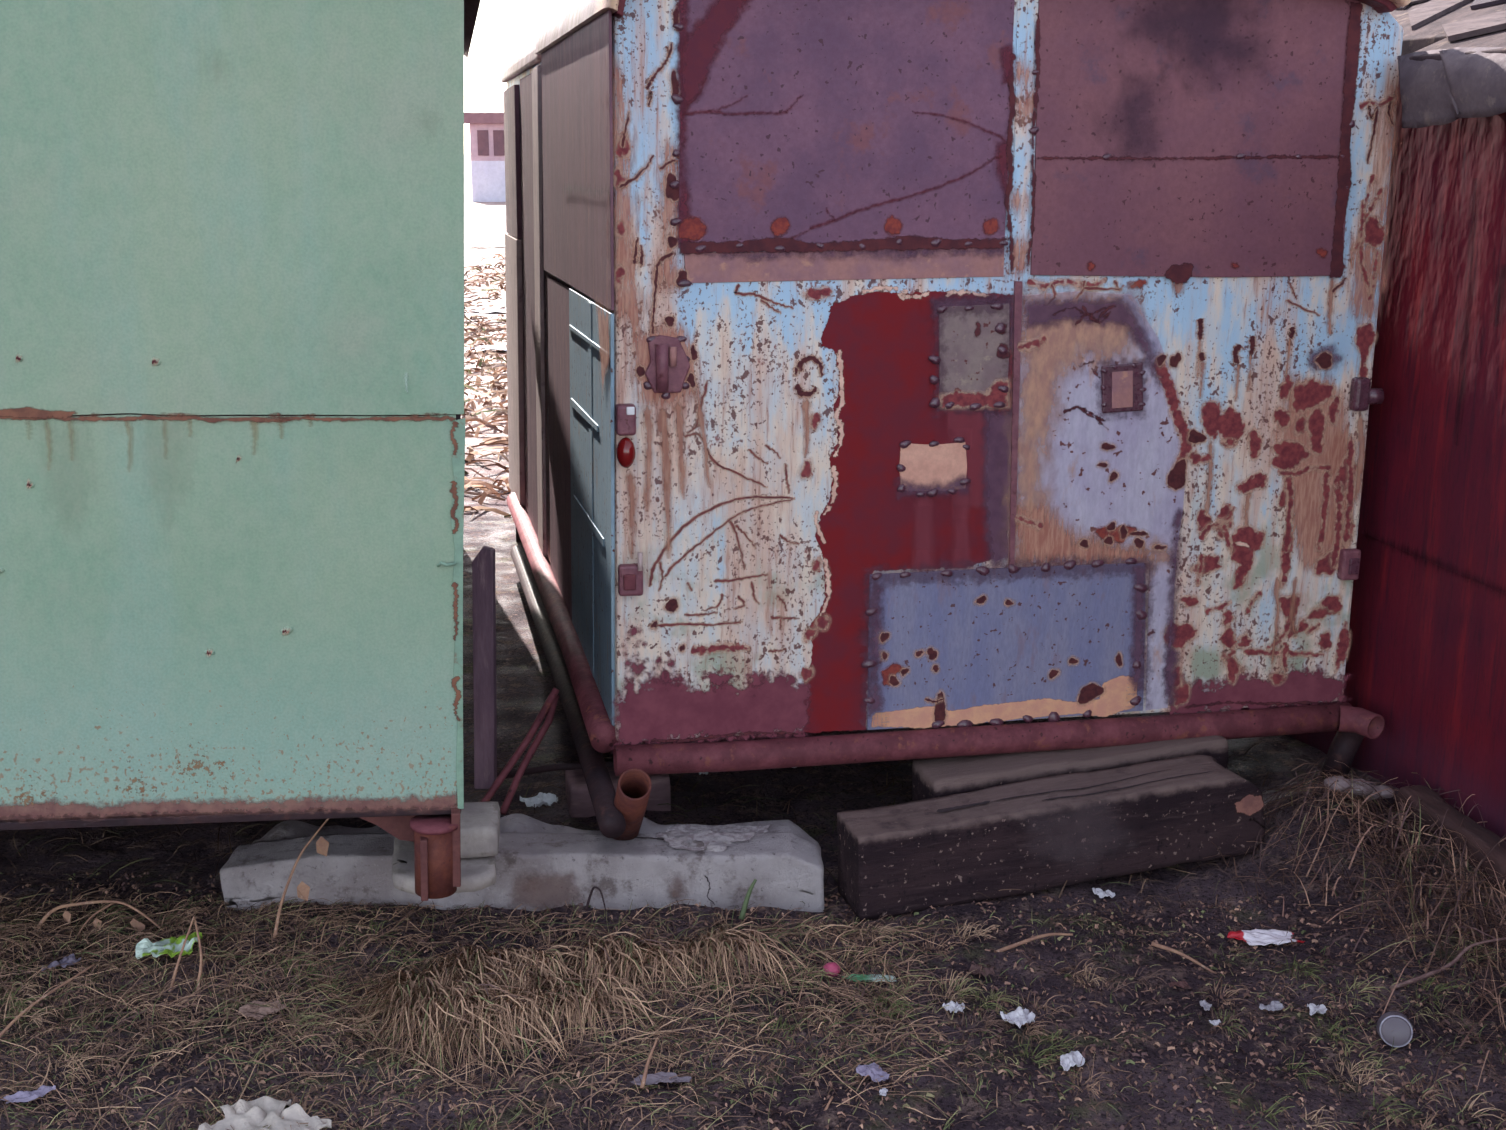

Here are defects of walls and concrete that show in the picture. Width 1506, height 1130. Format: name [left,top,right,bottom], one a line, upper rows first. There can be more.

corrosion [0,407,459,455]
corrosion [0,742,458,820]